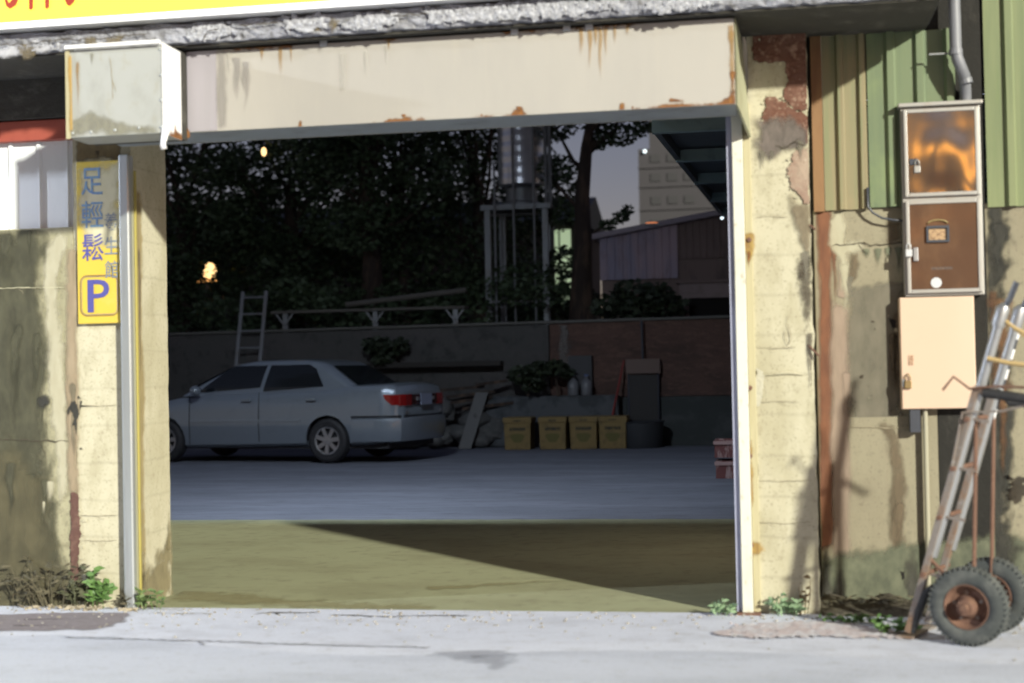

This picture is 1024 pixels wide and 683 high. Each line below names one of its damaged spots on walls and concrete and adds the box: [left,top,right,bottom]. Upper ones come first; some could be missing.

spalling [281,9,399,34]
spalling [420,0,623,25]
rust [548,24,633,52]
spalling [639,0,722,15]
rust [68,56,79,130]
peeling [752,33,810,205]
leakage [0,230,128,631]
rust [816,211,837,549]
leakage [820,208,1024,600]